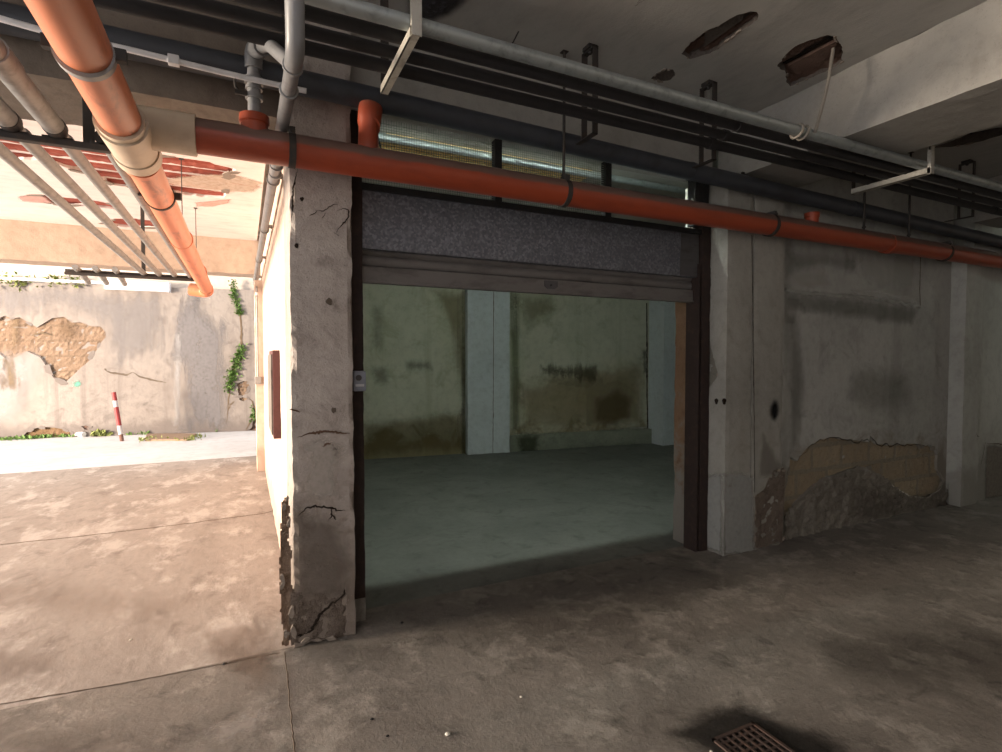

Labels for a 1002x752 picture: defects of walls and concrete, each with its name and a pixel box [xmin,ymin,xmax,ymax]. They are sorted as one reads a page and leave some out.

spalling [684,11,758,59]
spalling [781,35,844,85]
spalling [41,145,128,188]
spalling [162,155,261,207]
crack [291,169,349,233]
spalling [0,316,106,391]
damp [513,311,538,451]
crack [290,409,350,447]
damp [367,395,466,453]
crack [298,505,343,521]
spalling [279,495,348,646]
crack [1,589,346,752]